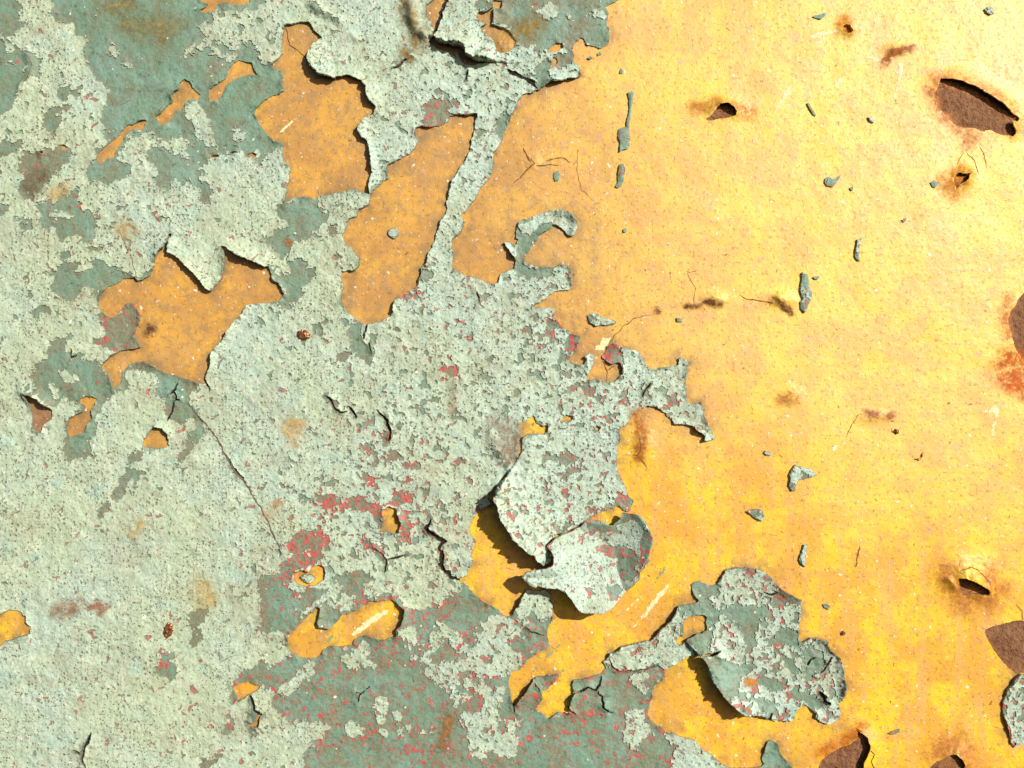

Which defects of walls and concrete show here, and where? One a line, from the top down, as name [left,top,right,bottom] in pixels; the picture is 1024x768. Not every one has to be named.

peeling [413,0,617,66]
rust [690,95,755,127]
rust [924,62,1024,147]
peeling [14,0,477,519]
peeling [504,209,578,285]
rust [998,288,1024,399]
crack [168,379,282,555]
peeling [0,610,31,646]
peeling [228,416,847,768]
rust [937,563,1024,679]
rust [813,715,883,768]
peeling [1002,673,1024,747]